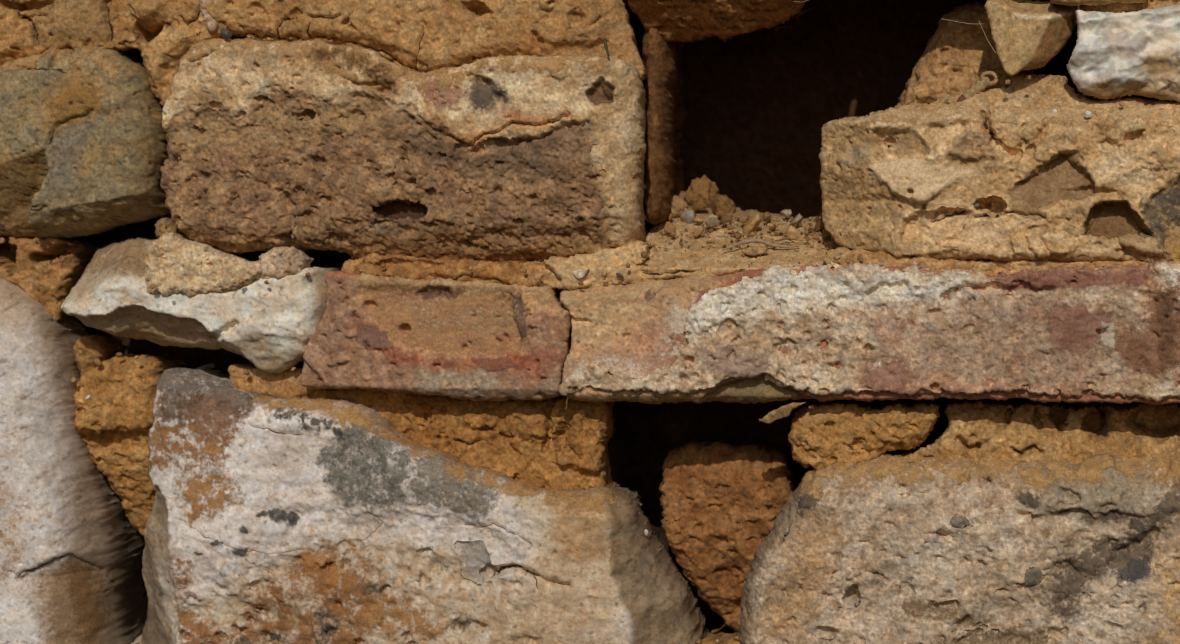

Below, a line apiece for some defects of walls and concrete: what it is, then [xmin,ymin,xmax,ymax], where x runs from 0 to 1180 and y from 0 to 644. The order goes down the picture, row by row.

crack [435,116,568,146]
crack [465,523,560,589]